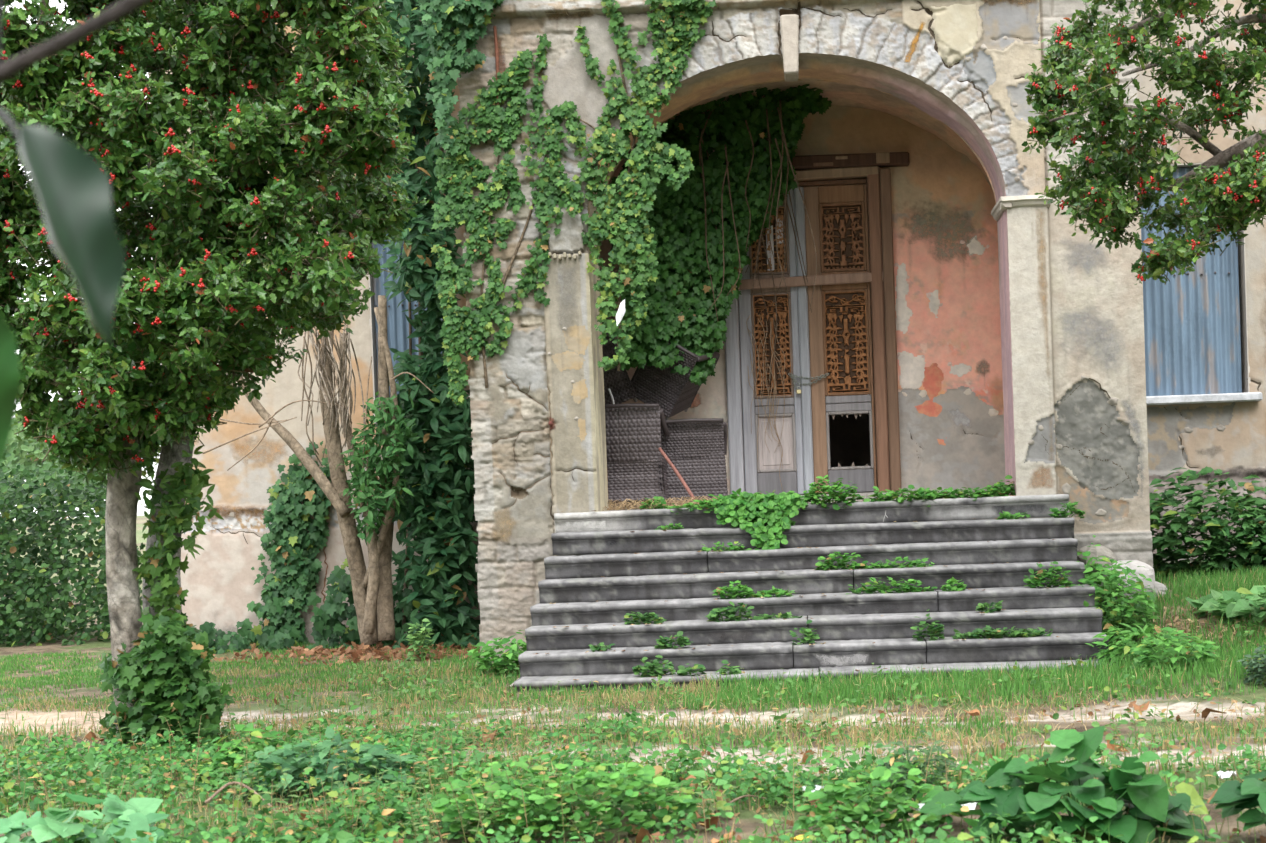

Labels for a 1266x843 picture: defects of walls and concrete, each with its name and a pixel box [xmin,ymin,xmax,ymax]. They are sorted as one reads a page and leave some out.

crack [704,21,746,42]
crack [777,0,992,121]
flaking render [930,0,1041,124]
water stain [906,210,973,259]
peeling [960,235,989,255]
peeling [894,263,913,334]
peeling [926,290,943,318]
flaking render [897,351,1006,497]
flaking render [1024,376,1235,524]